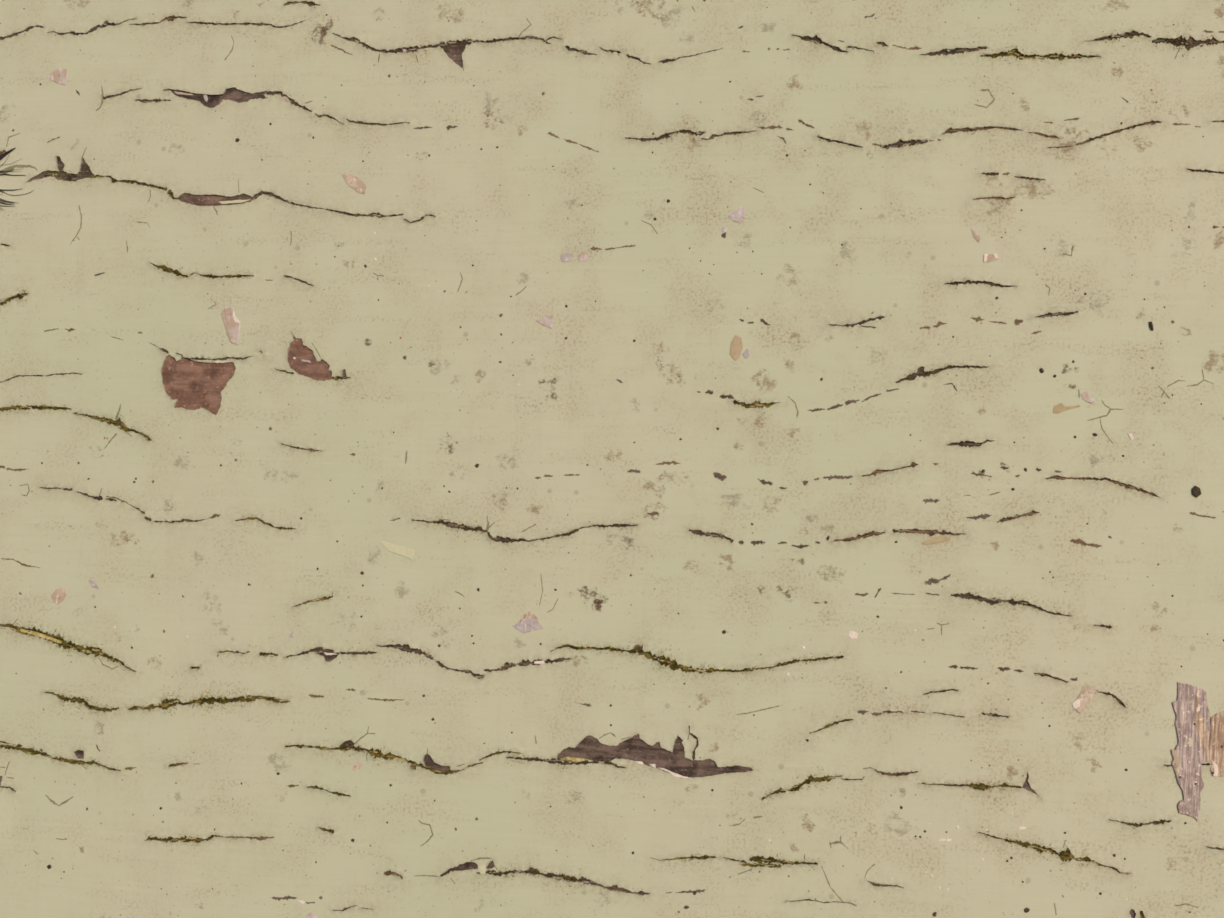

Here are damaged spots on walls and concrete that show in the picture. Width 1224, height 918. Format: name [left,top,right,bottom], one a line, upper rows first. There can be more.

crack [566,14,1224,149]
peeling [150,307,263,415]
peeling [275,331,351,382]
crack [0,373,152,449]
crack [689,439,1158,549]
crack [390,512,660,545]
crack [0,619,136,674]
crack [377,640,844,679]
crack [45,648,537,775]
crack [0,741,136,771]
peeling [506,725,753,778]
crack [146,830,274,849]